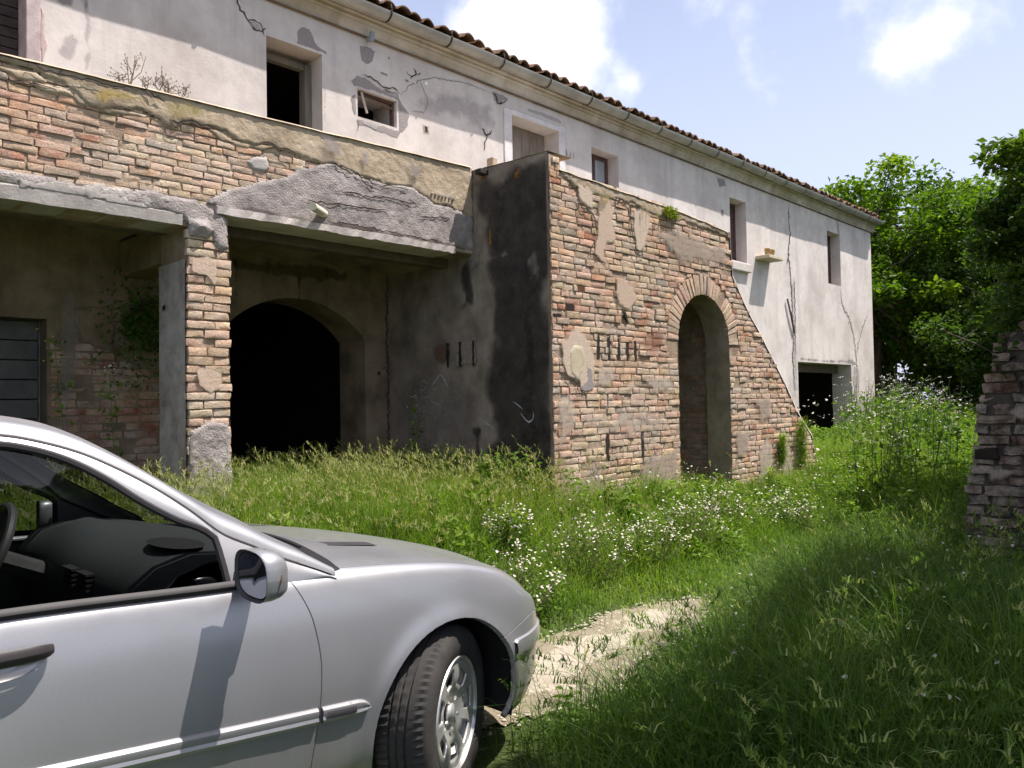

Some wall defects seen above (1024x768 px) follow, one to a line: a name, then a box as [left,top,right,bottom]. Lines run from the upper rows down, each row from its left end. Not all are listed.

crack [237,0,266,37]
crack [366,75,485,113]
peeling [18,179,172,208]
leakage [461,162,574,502]
crack [787,205,796,395]
crack [840,289,867,387]